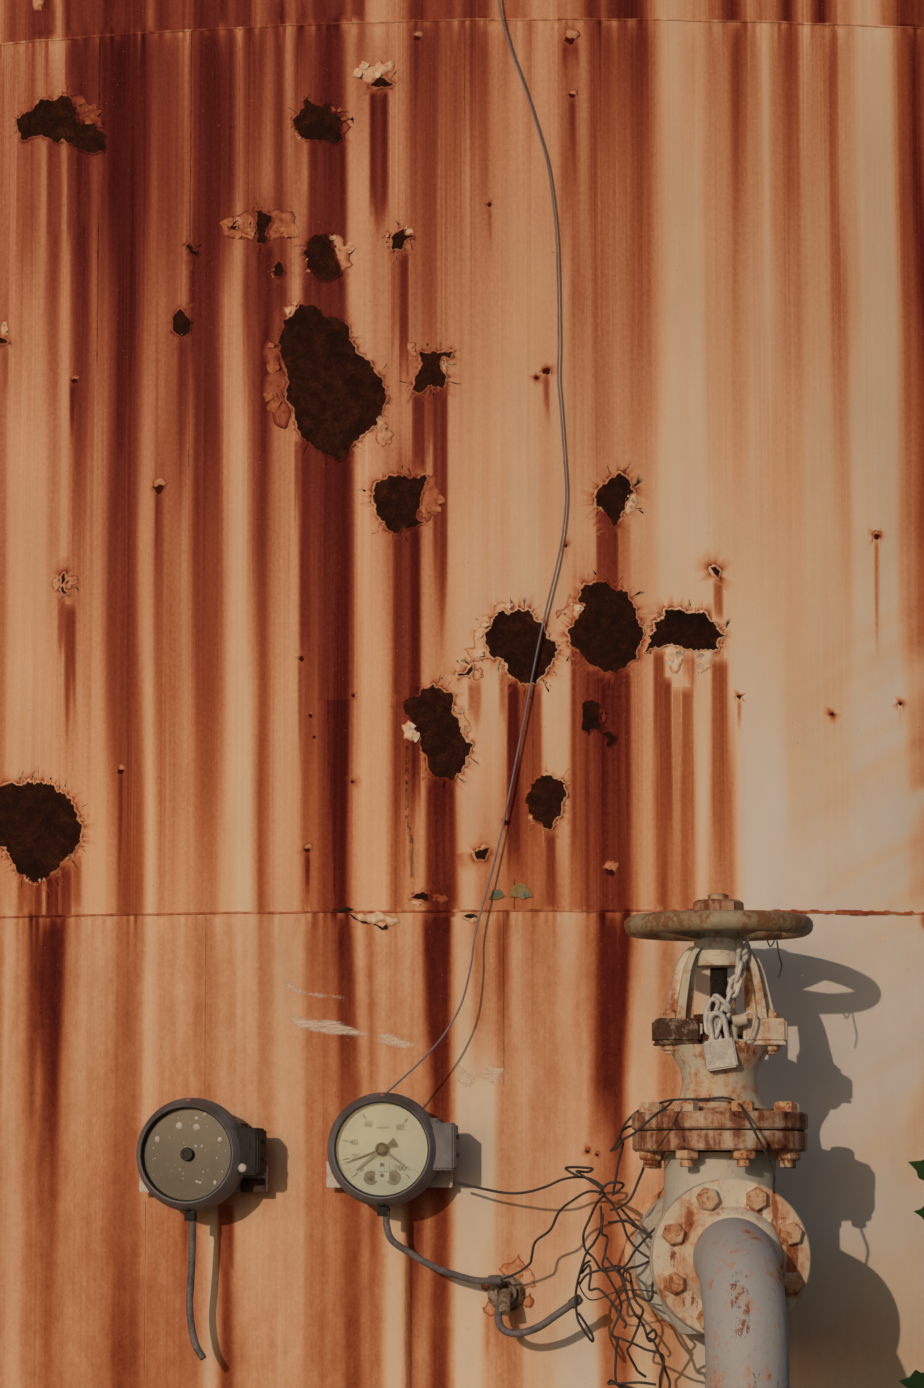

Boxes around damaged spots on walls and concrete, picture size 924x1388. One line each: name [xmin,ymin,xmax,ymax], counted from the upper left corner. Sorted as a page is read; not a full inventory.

corrosion [394,445,411,471]
corrosion [403,0,520,345]
corrosion [561,0,654,355]
corrosion [886,0,924,643]
corrosion [0,0,352,1388]
corrosion [390,722,637,1388]
corrosion [730,1275,750,1335]
corrosion [749,1207,799,1273]